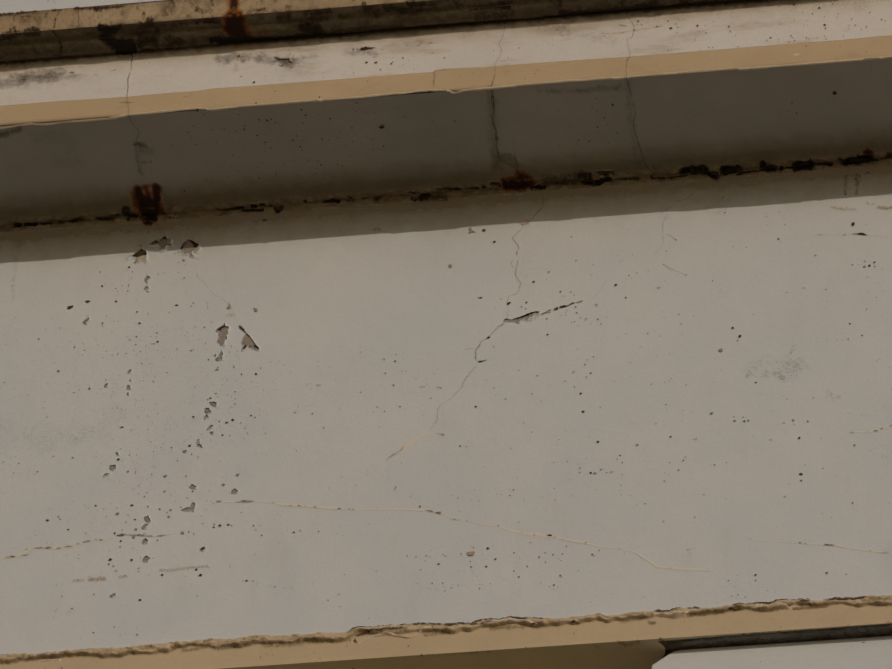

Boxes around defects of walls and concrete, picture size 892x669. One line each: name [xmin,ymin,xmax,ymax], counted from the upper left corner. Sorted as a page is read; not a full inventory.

damp [0,26,44,60]
damp [74,5,123,21]
rust [222,0,251,38]
damp [97,0,762,55]
rust [501,170,536,192]
rust [126,183,171,225]
peeling [100,231,203,306]
crack [0,532,186,560]
crack [207,500,713,572]
flaking render [345,616,543,644]
peeling [658,624,892,658]